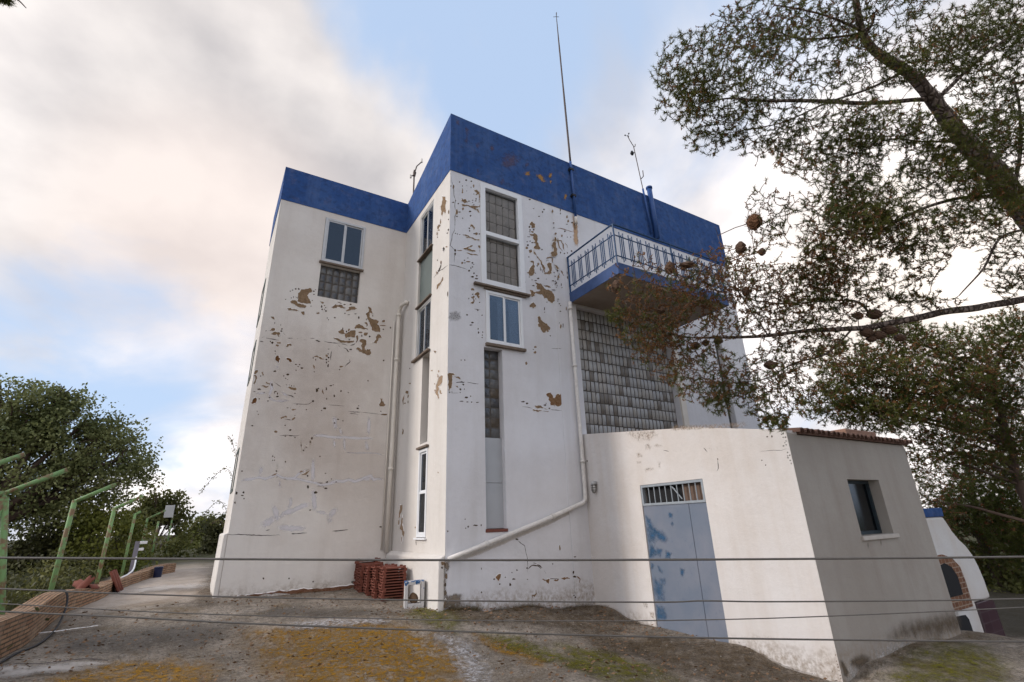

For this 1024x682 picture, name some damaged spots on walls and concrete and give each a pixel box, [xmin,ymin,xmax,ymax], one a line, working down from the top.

peeling [436,179,483,338]
peeling [526,195,573,349]
peeling [253,317,323,394]
peeling [285,287,391,356]
peeling [431,370,461,399]
peeling [521,392,562,412]
peeling [493,563,580,586]
peeling [647,520,670,567]